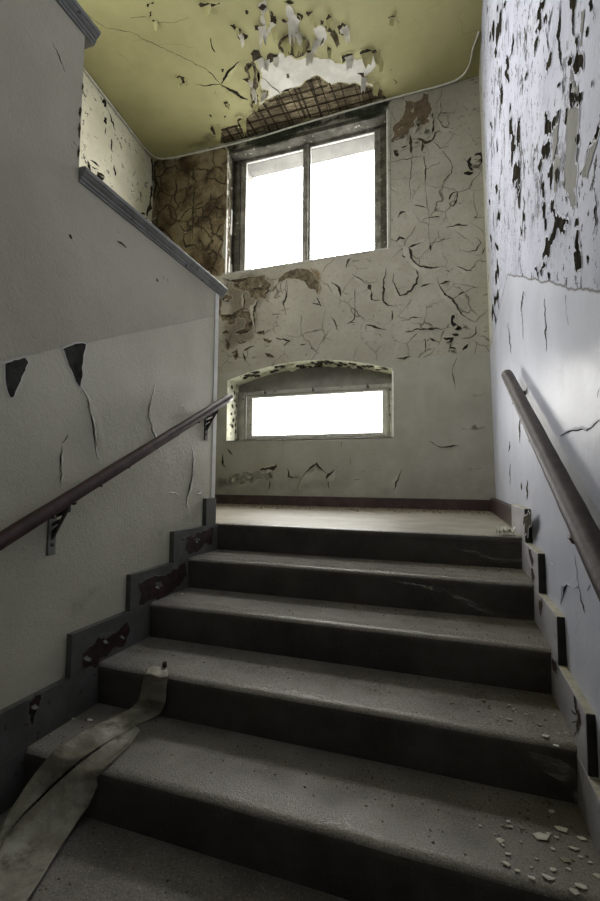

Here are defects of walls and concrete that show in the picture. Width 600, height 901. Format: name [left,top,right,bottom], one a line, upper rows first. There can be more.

crack [88,15,248,102]
peeling [489,2,524,236]
peeling [533,0,600,280]
spalling [132,0,397,380]
crack [241,99,485,347]
peeling [490,234,499,323]
spalling [4,357,29,399]
spalling [62,342,87,388]
crack [60,435,68,488]
crack [81,387,101,460]
crack [217,448,232,470]
crack [268,442,364,490]